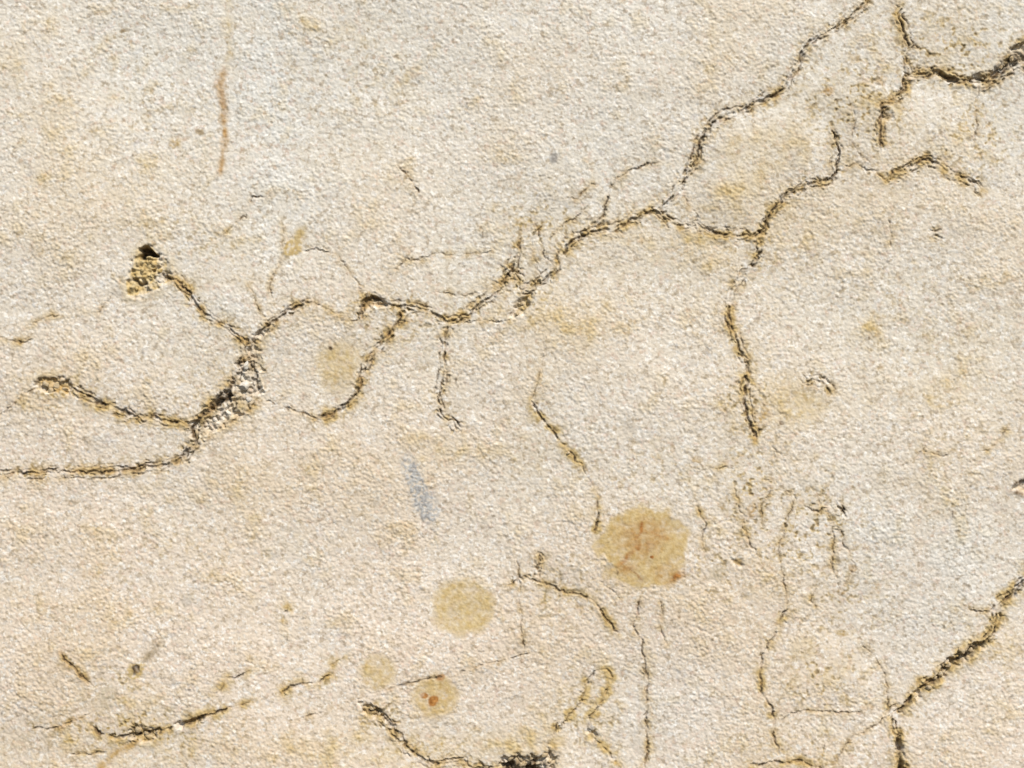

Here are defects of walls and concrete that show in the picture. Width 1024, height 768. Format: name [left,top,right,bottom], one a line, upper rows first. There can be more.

rust [215,0,240,177]
spalling [123,245,172,300]
crack [0,0,1024,482]
spalling [188,321,270,440]
crack [529,347,602,536]
rust [408,669,464,725]
water stain [429,574,498,640]
crack [278,548,669,768]
crack [689,465,1024,768]